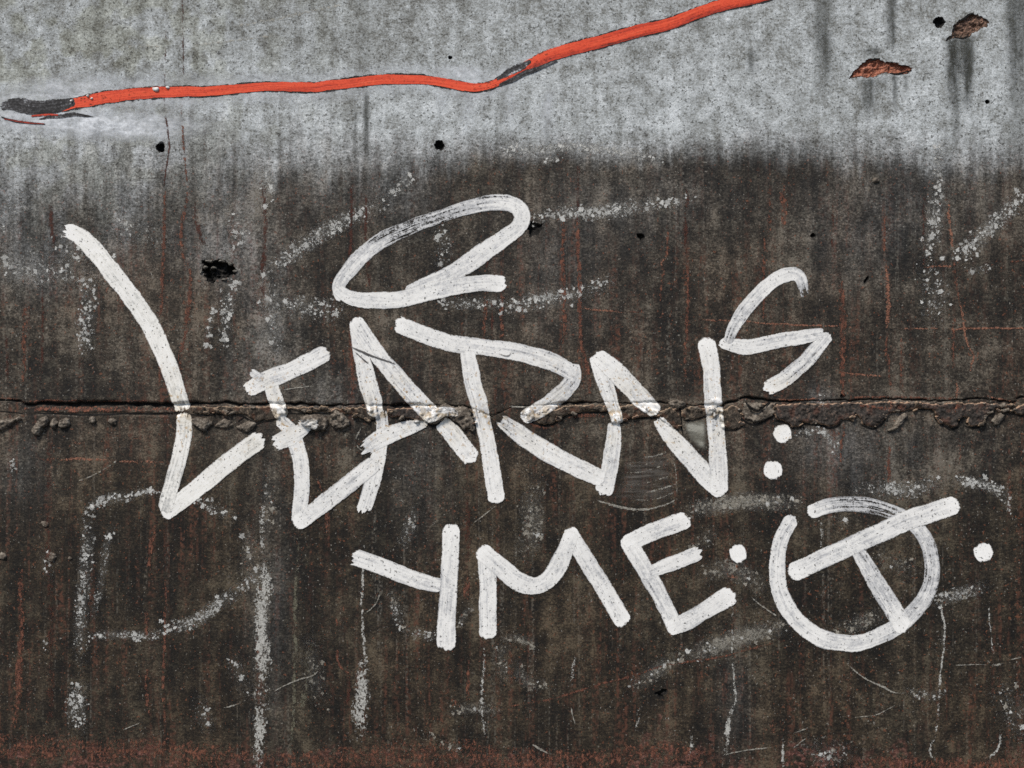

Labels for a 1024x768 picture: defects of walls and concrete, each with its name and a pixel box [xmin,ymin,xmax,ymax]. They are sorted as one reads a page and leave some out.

crack [0,396,1024,434]